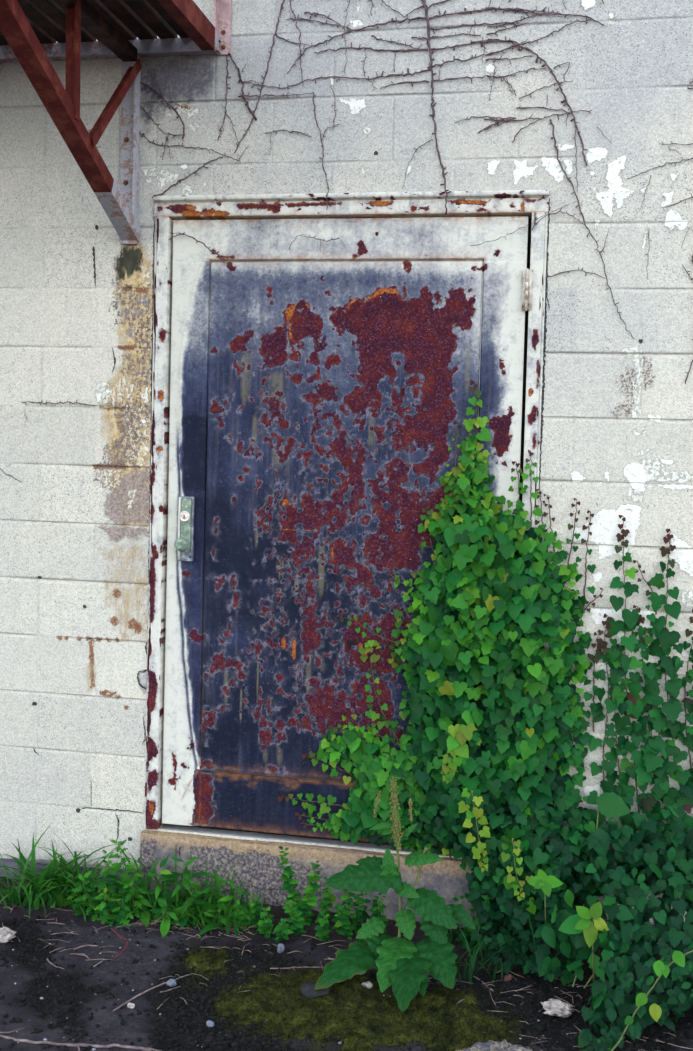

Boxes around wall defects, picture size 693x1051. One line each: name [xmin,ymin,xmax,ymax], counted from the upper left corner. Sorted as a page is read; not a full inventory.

peeling [487,160,501,175]
peeling [512,144,648,229]
peeling [661,173,693,231]
damp [115,256,142,280]
peeling [570,339,693,582]
damp [101,469,150,542]
peeling [670,534,693,609]
rust [57,617,142,710]